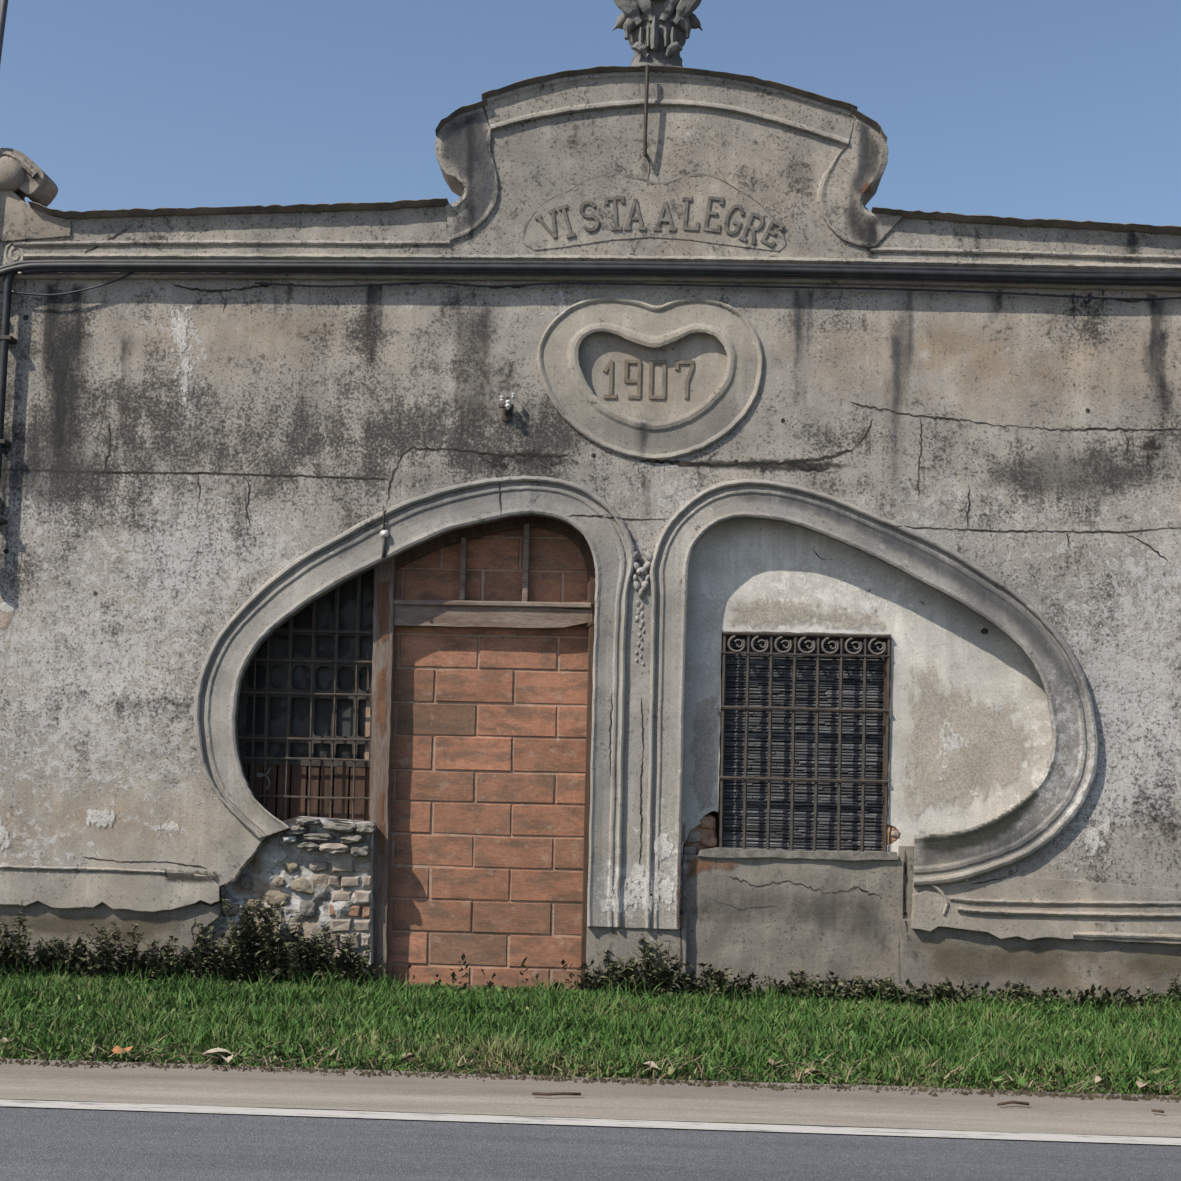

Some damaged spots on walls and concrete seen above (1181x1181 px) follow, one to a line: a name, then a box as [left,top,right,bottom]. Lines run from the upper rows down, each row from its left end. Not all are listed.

water stain [446,116,493,239]
water stain [849,126,878,259]
water stain [45,285,81,455]
water stain [1150,296,1169,404]
crack [1,418,568,560]
crack [642,402,1181,496]
crack [891,486,1180,561]
water stain [1140,437,1161,464]
peeling [601,697,717,915]
flaking render [187,793,384,979]